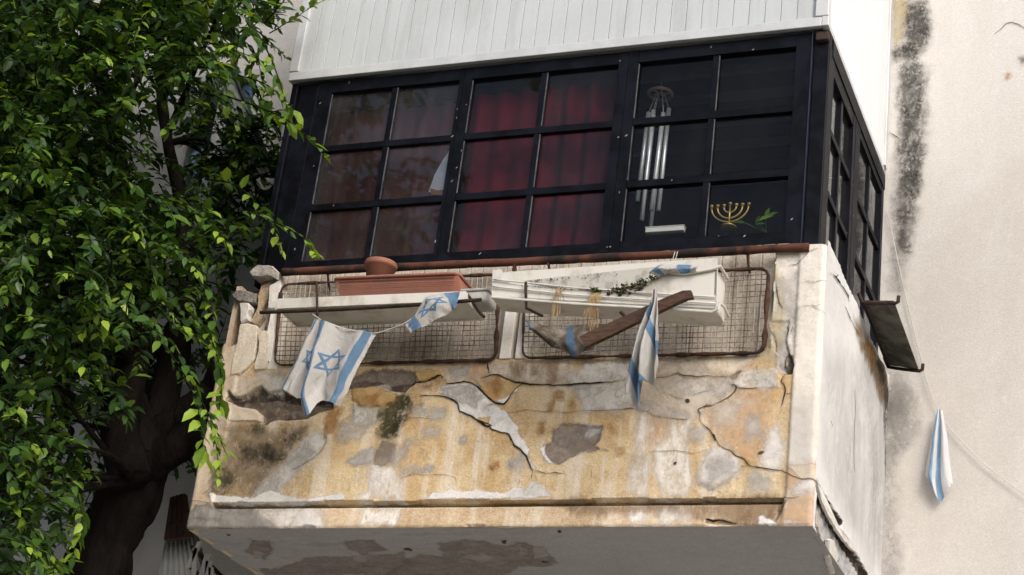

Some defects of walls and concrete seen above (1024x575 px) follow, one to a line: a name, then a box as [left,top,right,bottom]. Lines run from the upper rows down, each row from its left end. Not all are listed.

damp [893,0,929,281]
flaking render [228,280,334,425]
damp [212,423,300,496]
peeling [187,431,557,575]
damp [359,395,410,527]
peeling [338,362,608,500]
crack [404,363,818,515]